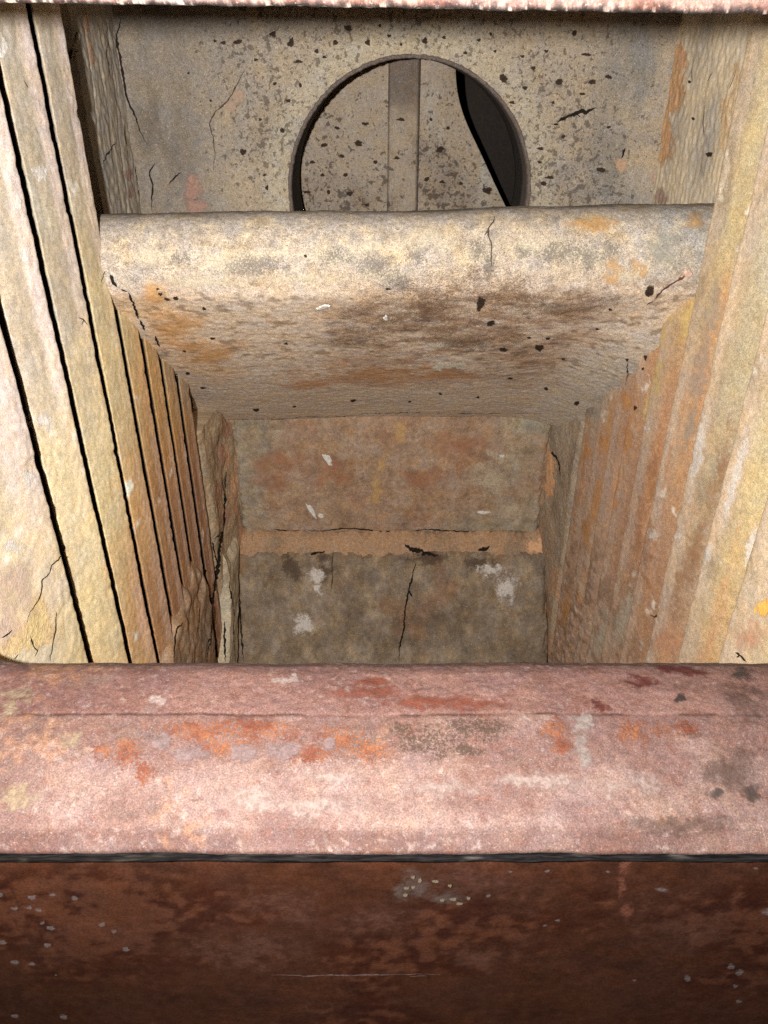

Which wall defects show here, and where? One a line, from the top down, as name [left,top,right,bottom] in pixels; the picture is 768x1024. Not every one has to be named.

crack [103,18,180,210]
crack [209,70,245,171]
crack [485,216,495,266]
crack [2,545,65,661]
efflorescence [294,615,313,634]
efflorescence [307,568,324,593]
crack [273,528,514,662]
efflorescence [477,564,518,602]
rust [629,674,652,688]
rust [657,665,703,675]
rust [92,734,154,786]
rust [154,716,395,764]